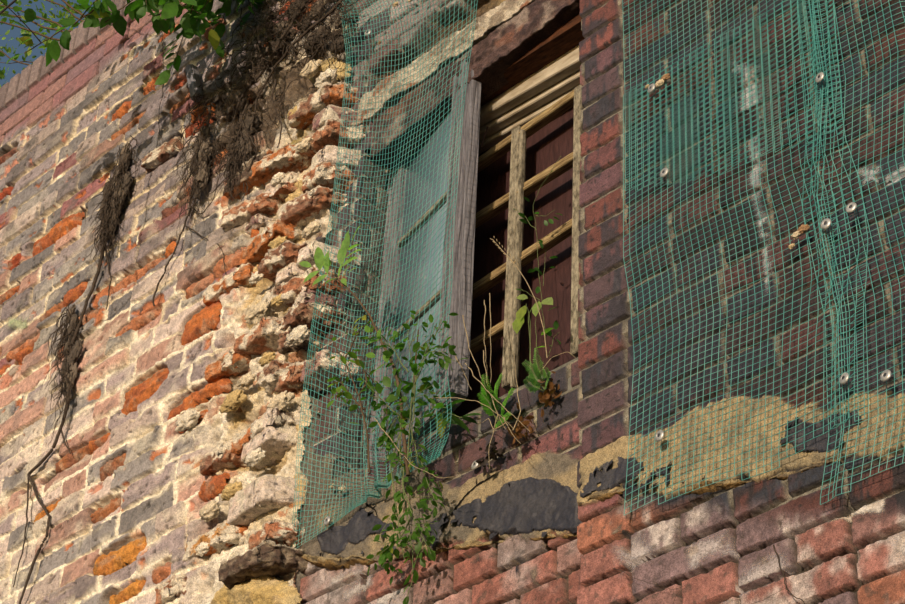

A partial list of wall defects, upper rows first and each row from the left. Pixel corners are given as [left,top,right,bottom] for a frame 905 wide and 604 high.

spalling [412,0,506,61]
spalling [111,100,146,141]
spalling [141,76,215,173]
spalling [111,241,176,294]
spalling [167,82,367,434]
spalling [115,308,162,337]
spalling [121,368,169,415]
peeling [779,409,862,453]
spalling [109,405,320,604]
crack [441,469,504,530]
peeling [421,456,671,547]
peeling [317,506,400,568]